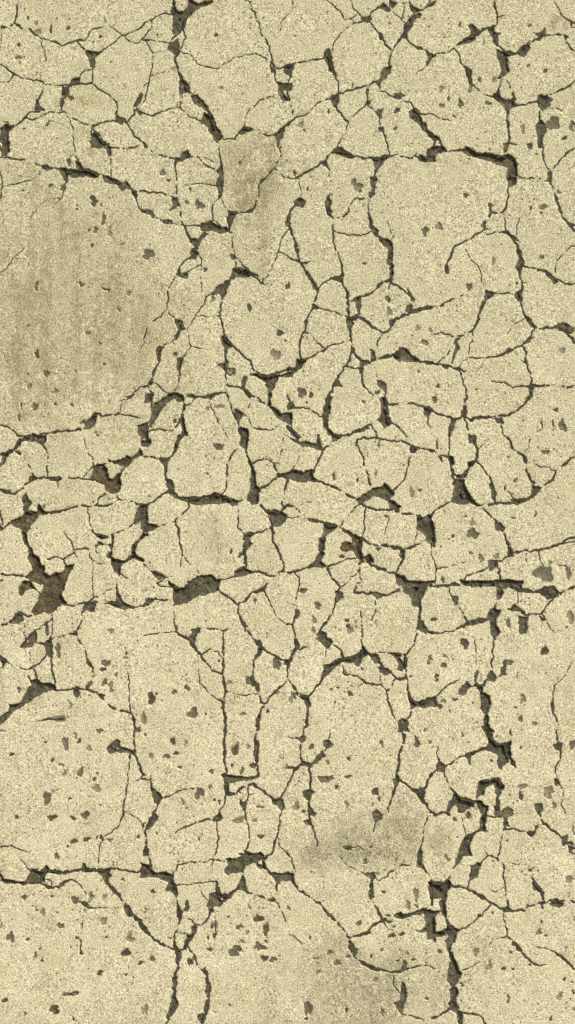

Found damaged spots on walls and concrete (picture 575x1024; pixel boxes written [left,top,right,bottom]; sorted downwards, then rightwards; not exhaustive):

crack [0,0,575,776]
crack [0,652,444,1024]
crack [402,987,486,1024]
crack [339,717,575,966]
crack [537,946,575,970]
crack [551,661,574,814]